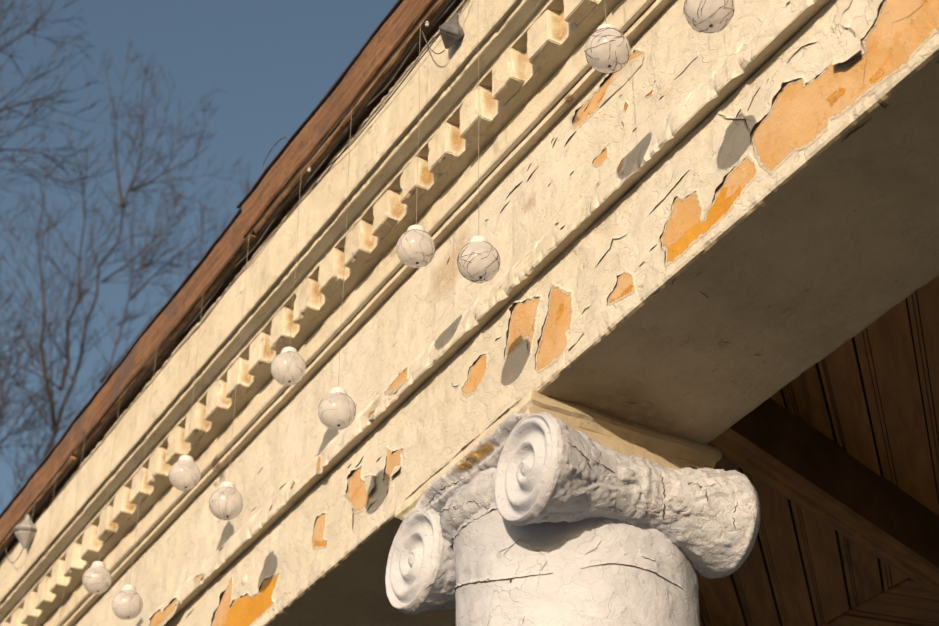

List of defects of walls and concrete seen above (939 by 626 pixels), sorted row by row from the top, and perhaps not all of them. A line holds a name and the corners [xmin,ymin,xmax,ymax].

crack [718,86,760,145]
peeling [659,0,939,268]
crack [649,169,689,214]
crack [595,233,627,267]
peeling [606,270,636,307]
peeling [504,281,583,374]
peeling [344,446,406,515]
crack [348,399,521,529]
crack [425,536,553,590]
crack [580,539,683,588]
peeling [149,594,180,626]
peeling [211,571,281,626]